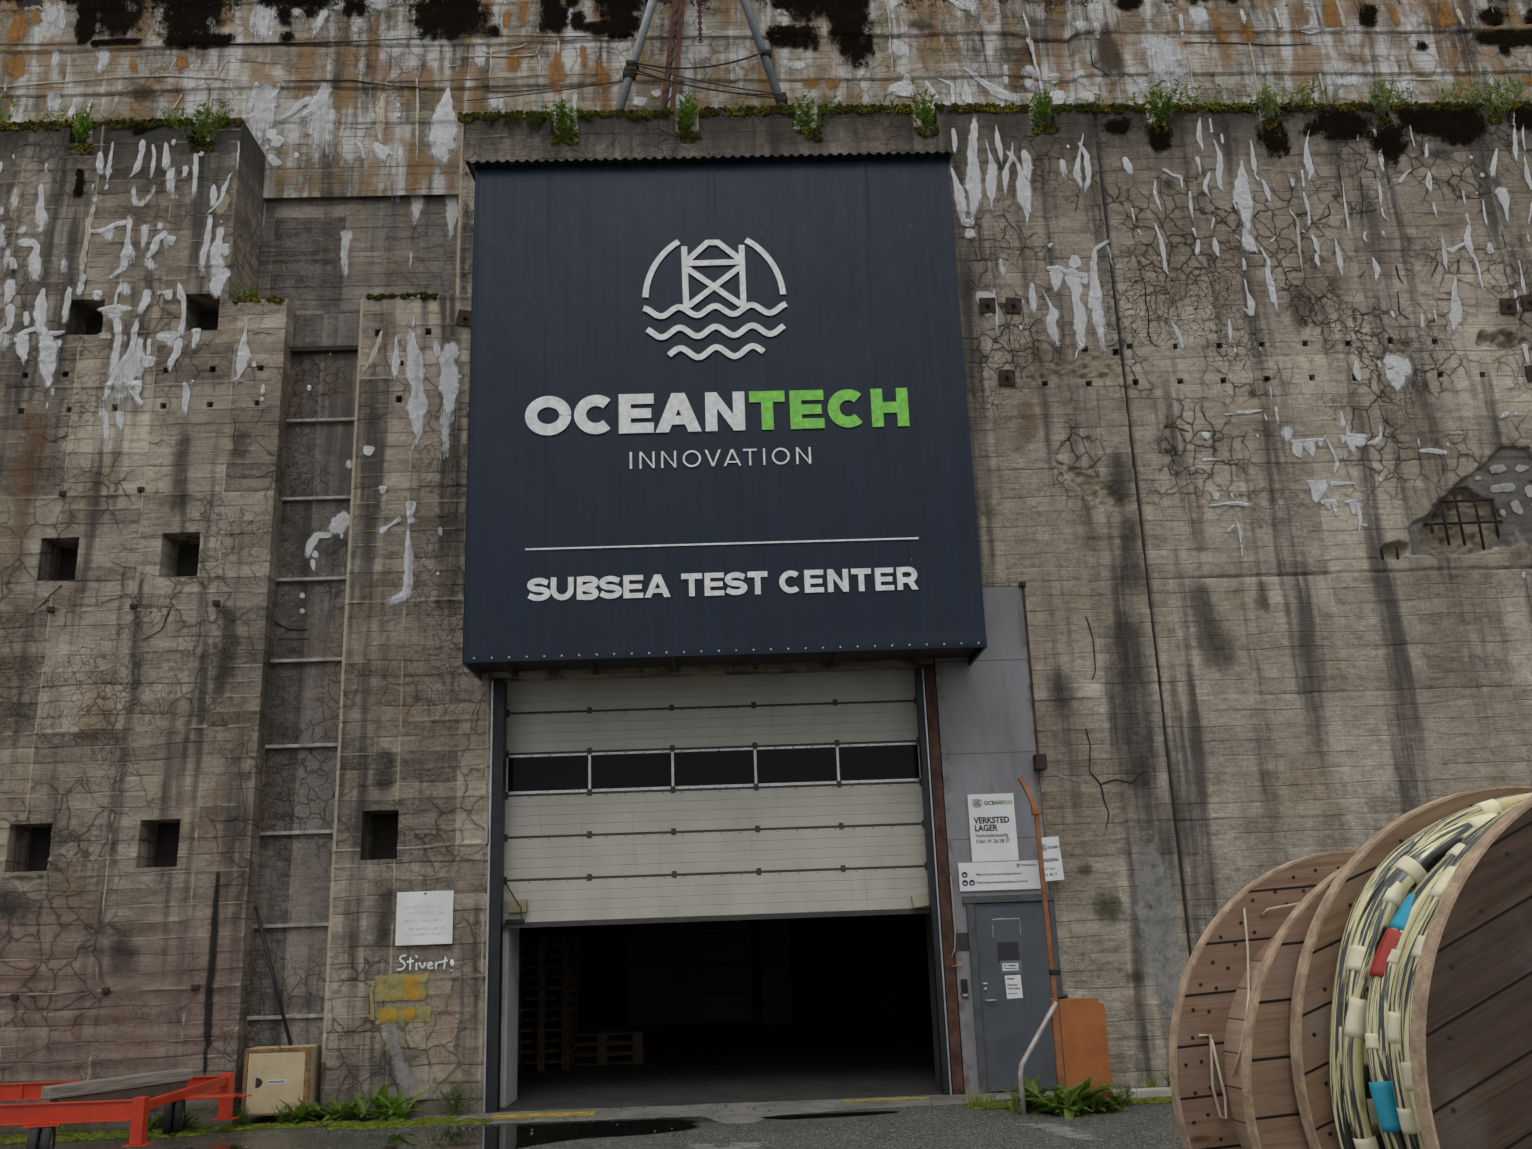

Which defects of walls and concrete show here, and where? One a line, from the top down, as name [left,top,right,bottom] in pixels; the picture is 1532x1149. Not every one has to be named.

corrosion [1212,9,1255,43]
corrosion [1274,0,1347,40]
corrosion [1435,2,1465,32]
leakage [0,50,339,447]
crack [1134,259,1159,347]
leakage [1131,118,1279,353]
crack [1359,258,1462,319]
leakage [1420,113,1532,332]
leakage [363,315,462,459]
spalling [1379,446,1532,560]
crack [1085,617,1096,680]
crack [1050,728,1144,829]